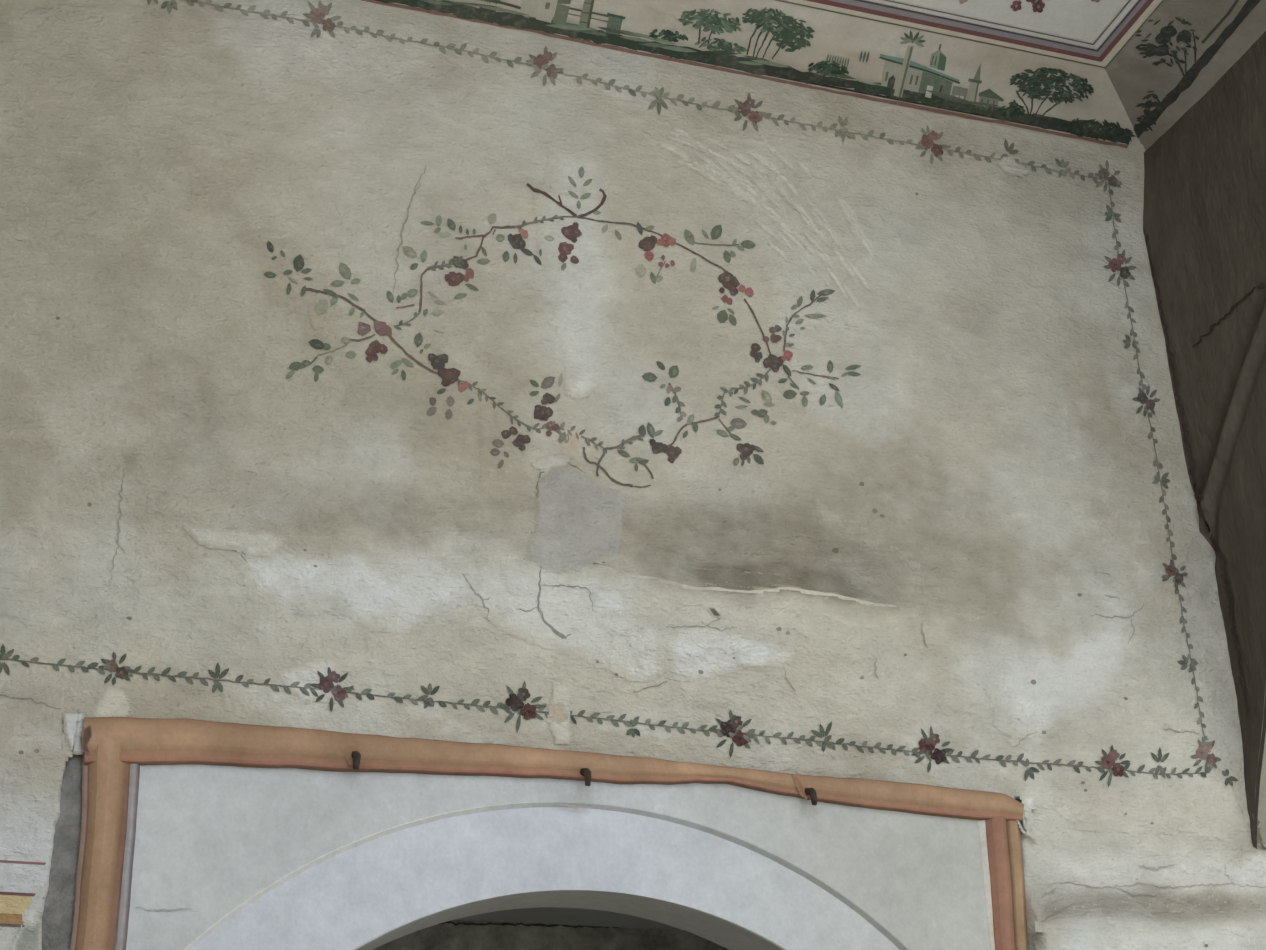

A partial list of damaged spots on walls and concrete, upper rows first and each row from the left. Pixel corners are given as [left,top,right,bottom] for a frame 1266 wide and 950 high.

leakage [88,253,553,571]
crack [536,462,582,499]
leakage [610,393,1089,669]
crack [462,573,490,622]
crack [519,532,605,639]
crack [1033,865,1266,950]